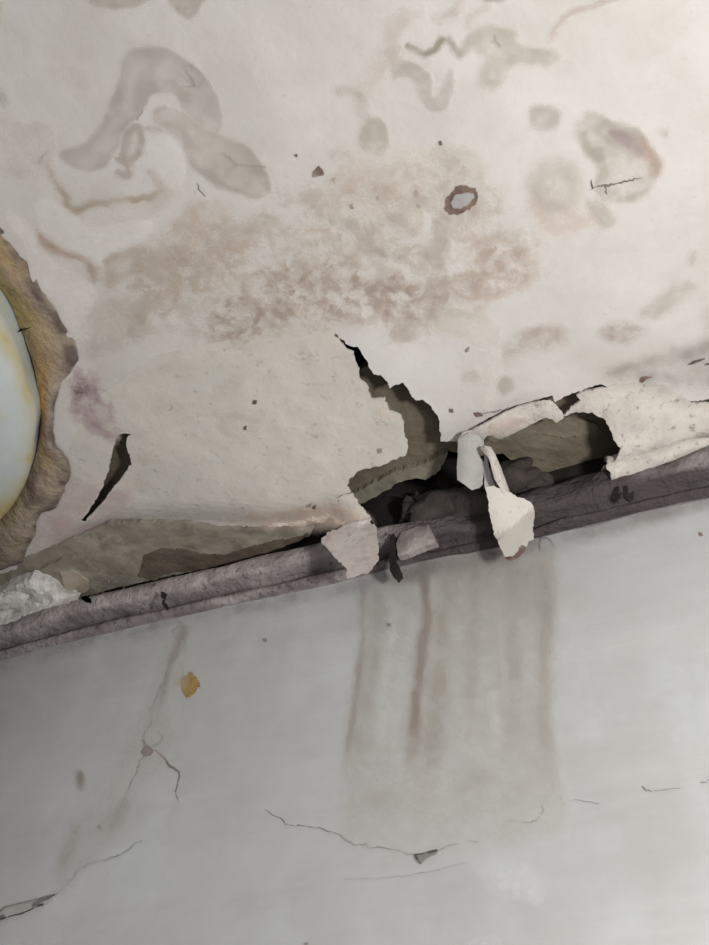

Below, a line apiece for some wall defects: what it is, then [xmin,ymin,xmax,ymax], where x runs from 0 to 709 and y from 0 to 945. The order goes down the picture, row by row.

leakage [89,0,147,10]
leakage [169,0,205,19]
leakage [9,46,530,354]
leakage [530,105,561,130]
leakage [530,114,660,231]
peeling [0,329,408,625]
peeling [457,377,709,561]
leakage [361,552,553,755]
crack [266,810,478,880]